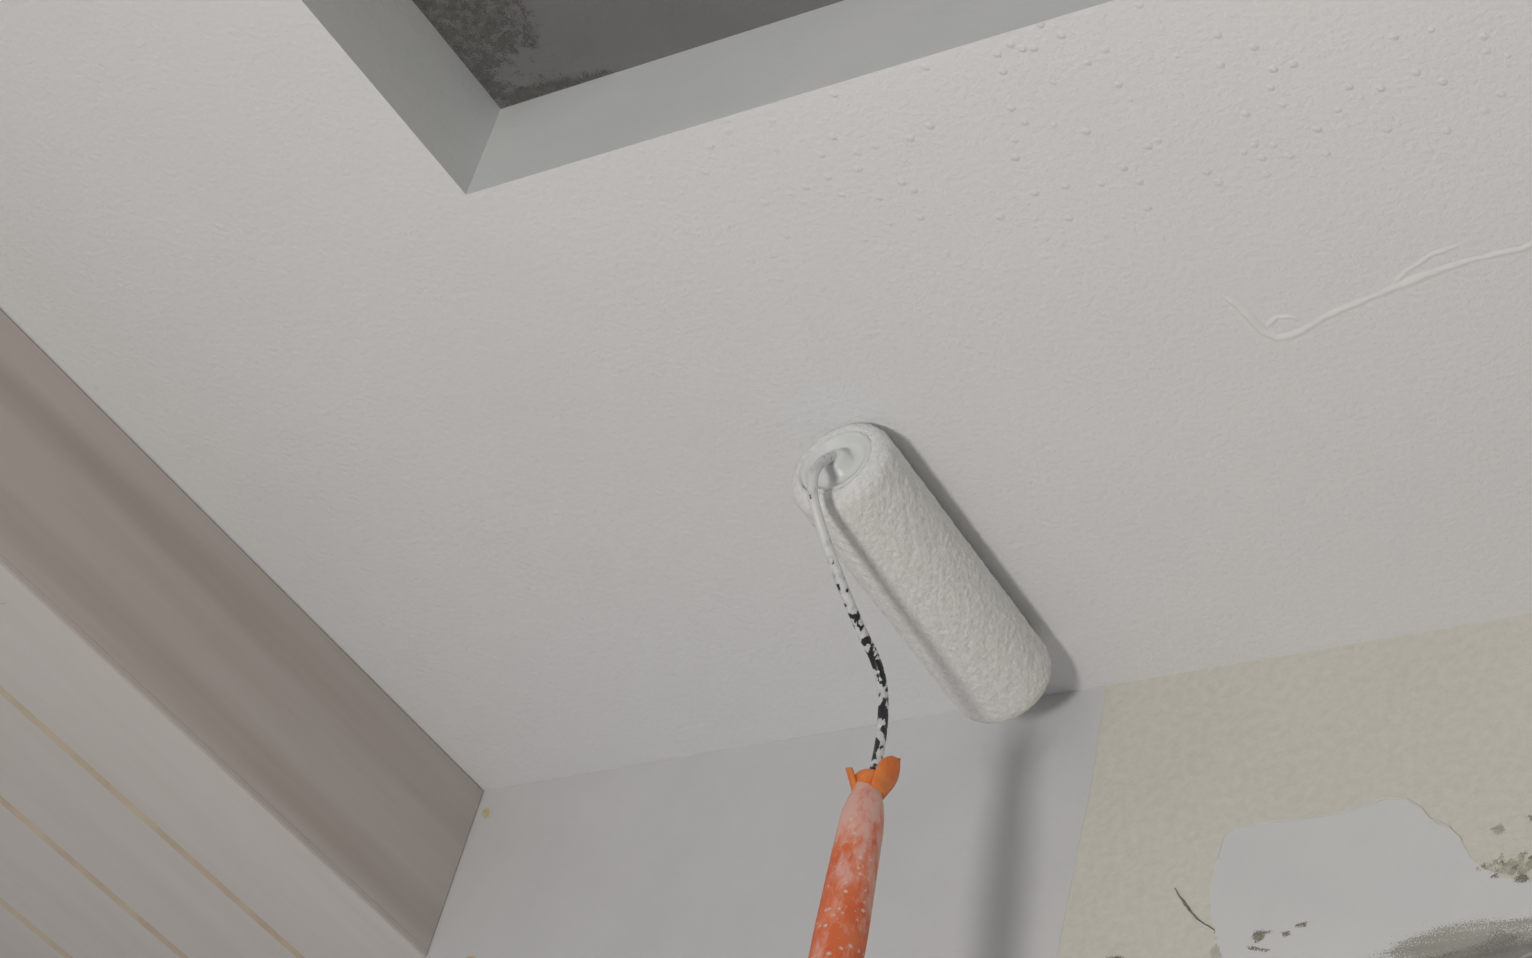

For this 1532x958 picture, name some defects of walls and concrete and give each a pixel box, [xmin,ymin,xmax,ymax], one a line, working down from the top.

water stain [413,0,619,108]
peeling [1210,797,1532,958]